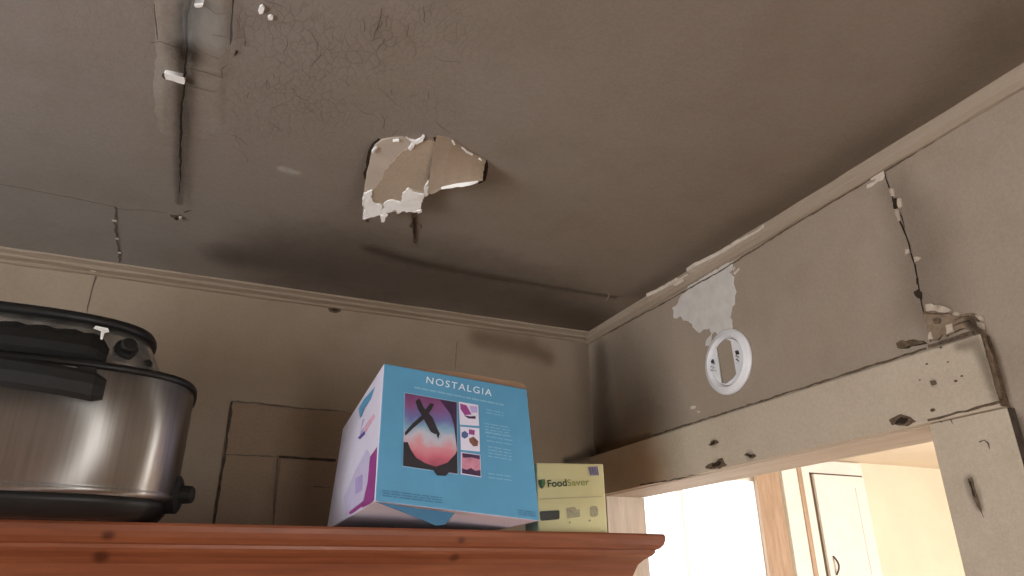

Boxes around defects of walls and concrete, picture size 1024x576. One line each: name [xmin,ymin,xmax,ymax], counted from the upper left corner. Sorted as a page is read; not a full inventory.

peeling [162,70,185,84]
crack [1,0,246,263]
peeling [393,134,425,151]
peeling [604,120,970,346]
crack [884,172,924,312]
flaking render [896,304,986,349]
spalling [889,414,916,426]
spalling [705,458,727,469]